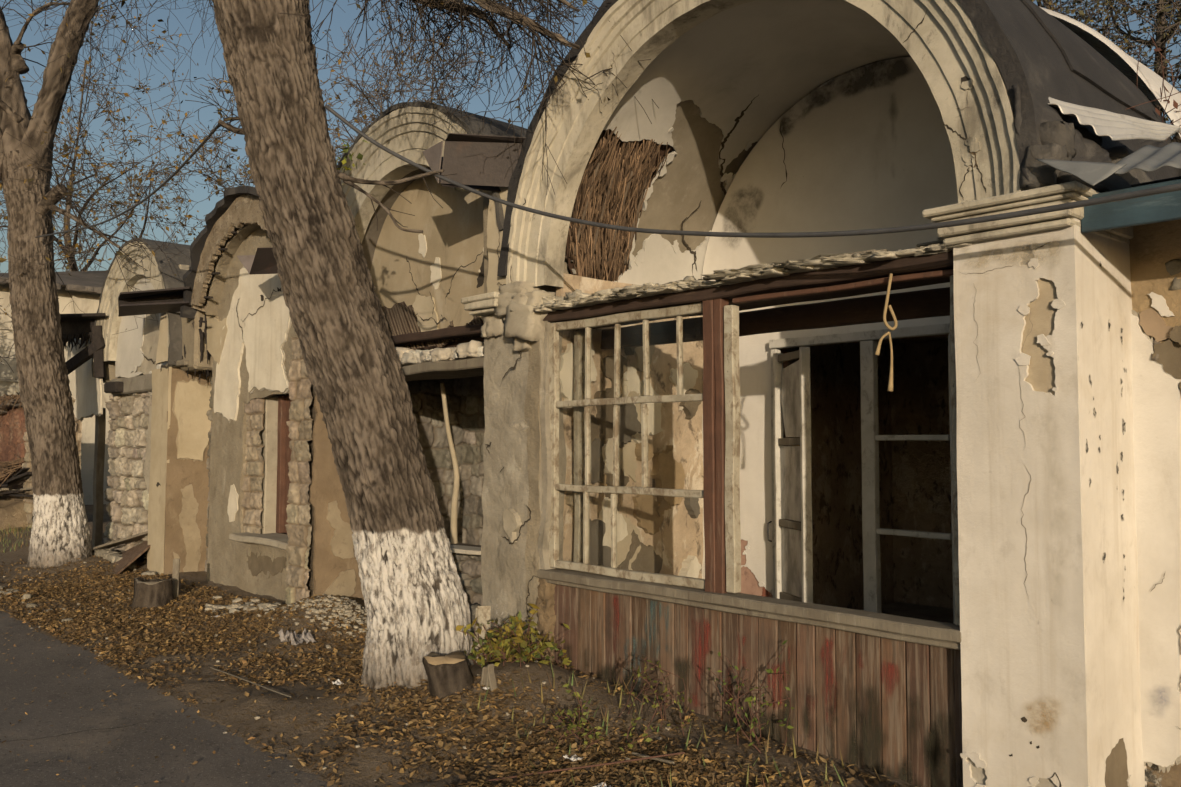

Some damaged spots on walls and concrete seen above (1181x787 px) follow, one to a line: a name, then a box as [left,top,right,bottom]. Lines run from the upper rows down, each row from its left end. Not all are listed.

peeling [566,100,758,282]
crack [681,96,758,275]
crack [943,92,986,197]
peeling [172,197,292,462]
peeling [382,233,484,350]
crack [406,228,512,325]
peeling [1014,242,1066,395]
peeling [1129,219,1181,787]
peeling [960,751,987,787]
peeling [1029,773,1061,787]
peeling [1105,738,1133,787]